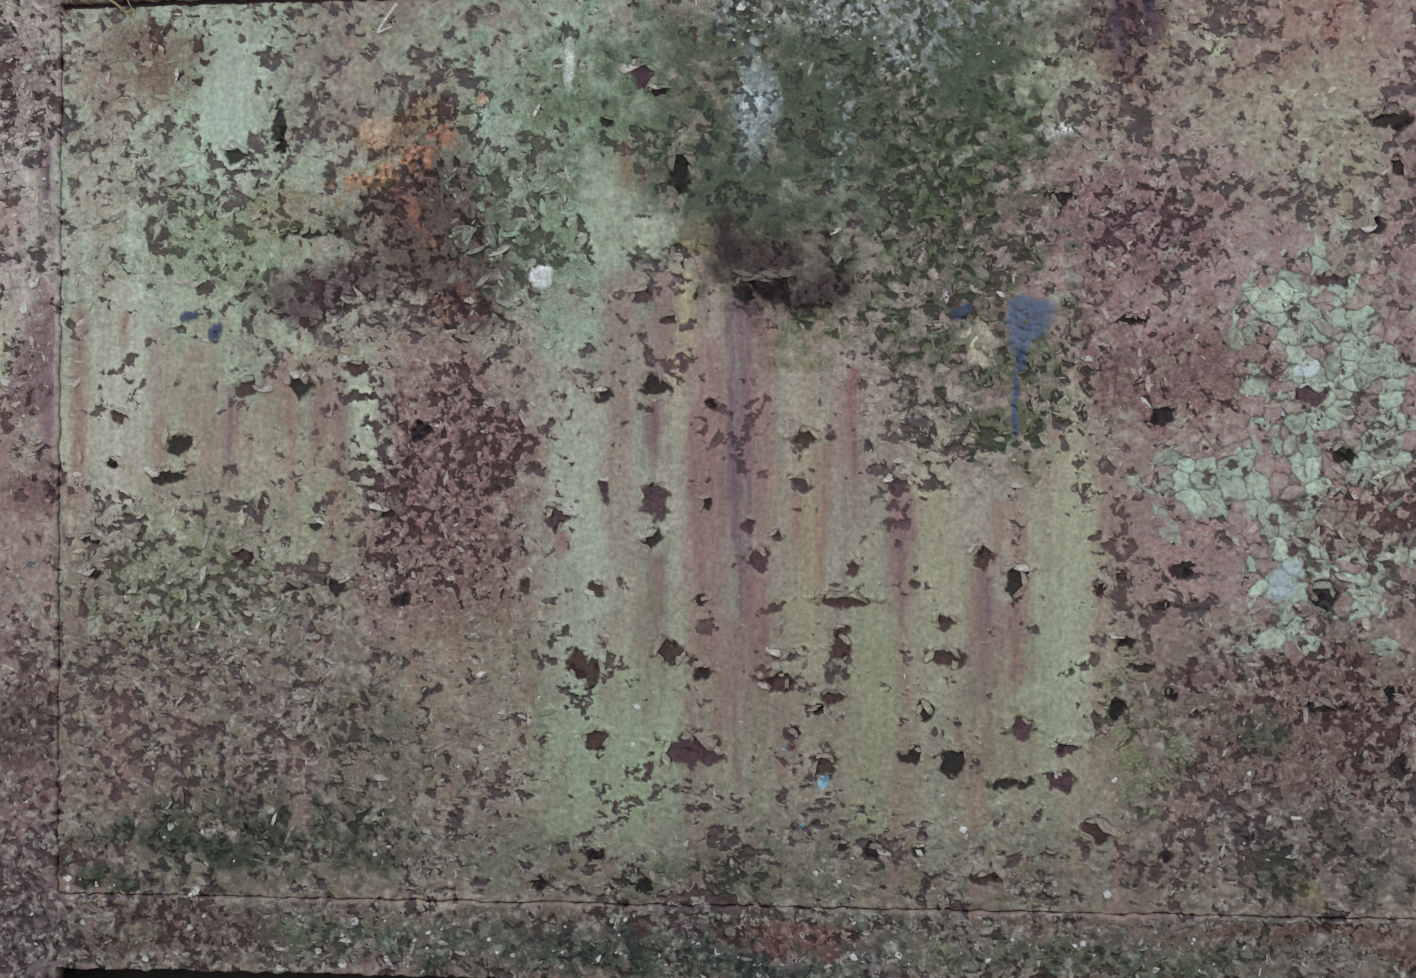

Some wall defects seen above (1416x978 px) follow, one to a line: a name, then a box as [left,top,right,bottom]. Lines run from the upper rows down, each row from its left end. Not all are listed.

corrosion [1056,0,1185,98]
corrosion [1263,0,1398,108]
corrosion [1022,167,1258,292]
peeling [0,0,758,974]
corrosion [217,78,586,700]
corrosion [595,205,866,831]
corrosion [880,492,920,634]
peeling [565,0,1416,911]
corrosion [963,497,1030,728]
corrosion [1058,293,1416,911]
peeling [524,914,1399,978]
corrosion [1115,920,1416,975]